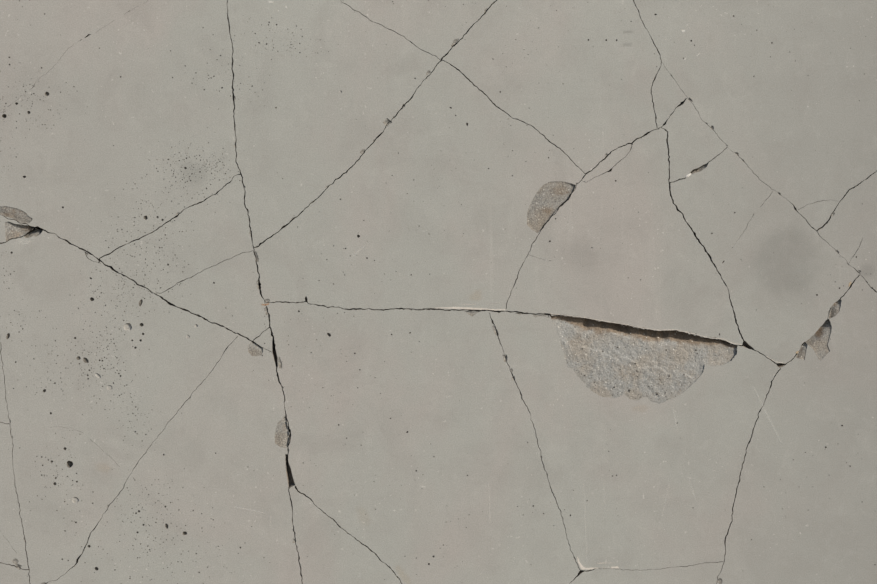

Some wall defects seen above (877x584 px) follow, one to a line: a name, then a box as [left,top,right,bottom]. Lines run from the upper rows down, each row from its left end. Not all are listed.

spalling [0,206,43,242]
spalling [527,181,576,233]
crack [732,171,877,316]
crack [0,0,578,584]
spalling [516,313,737,404]
crack [526,34,805,584]
spalling [796,299,842,361]